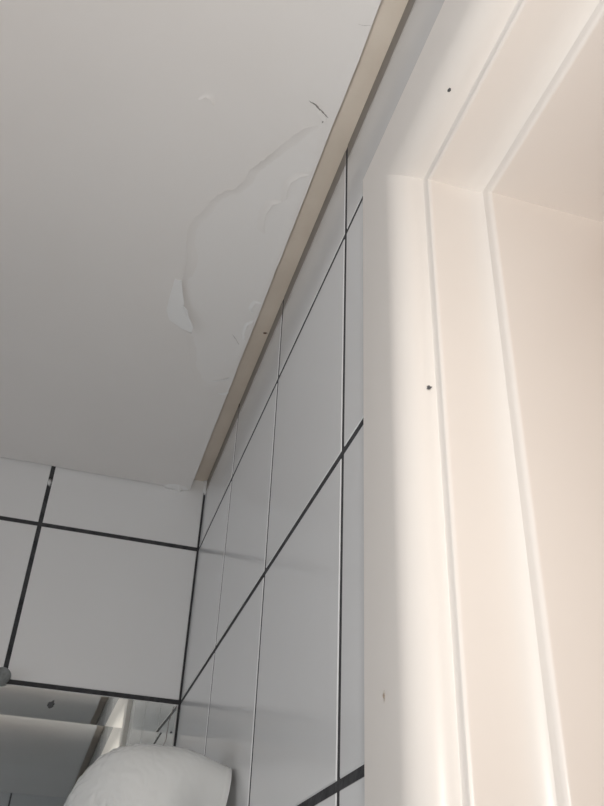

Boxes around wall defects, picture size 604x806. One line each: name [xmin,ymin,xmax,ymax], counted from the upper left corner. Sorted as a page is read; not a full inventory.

peeling [167,123,325,395]